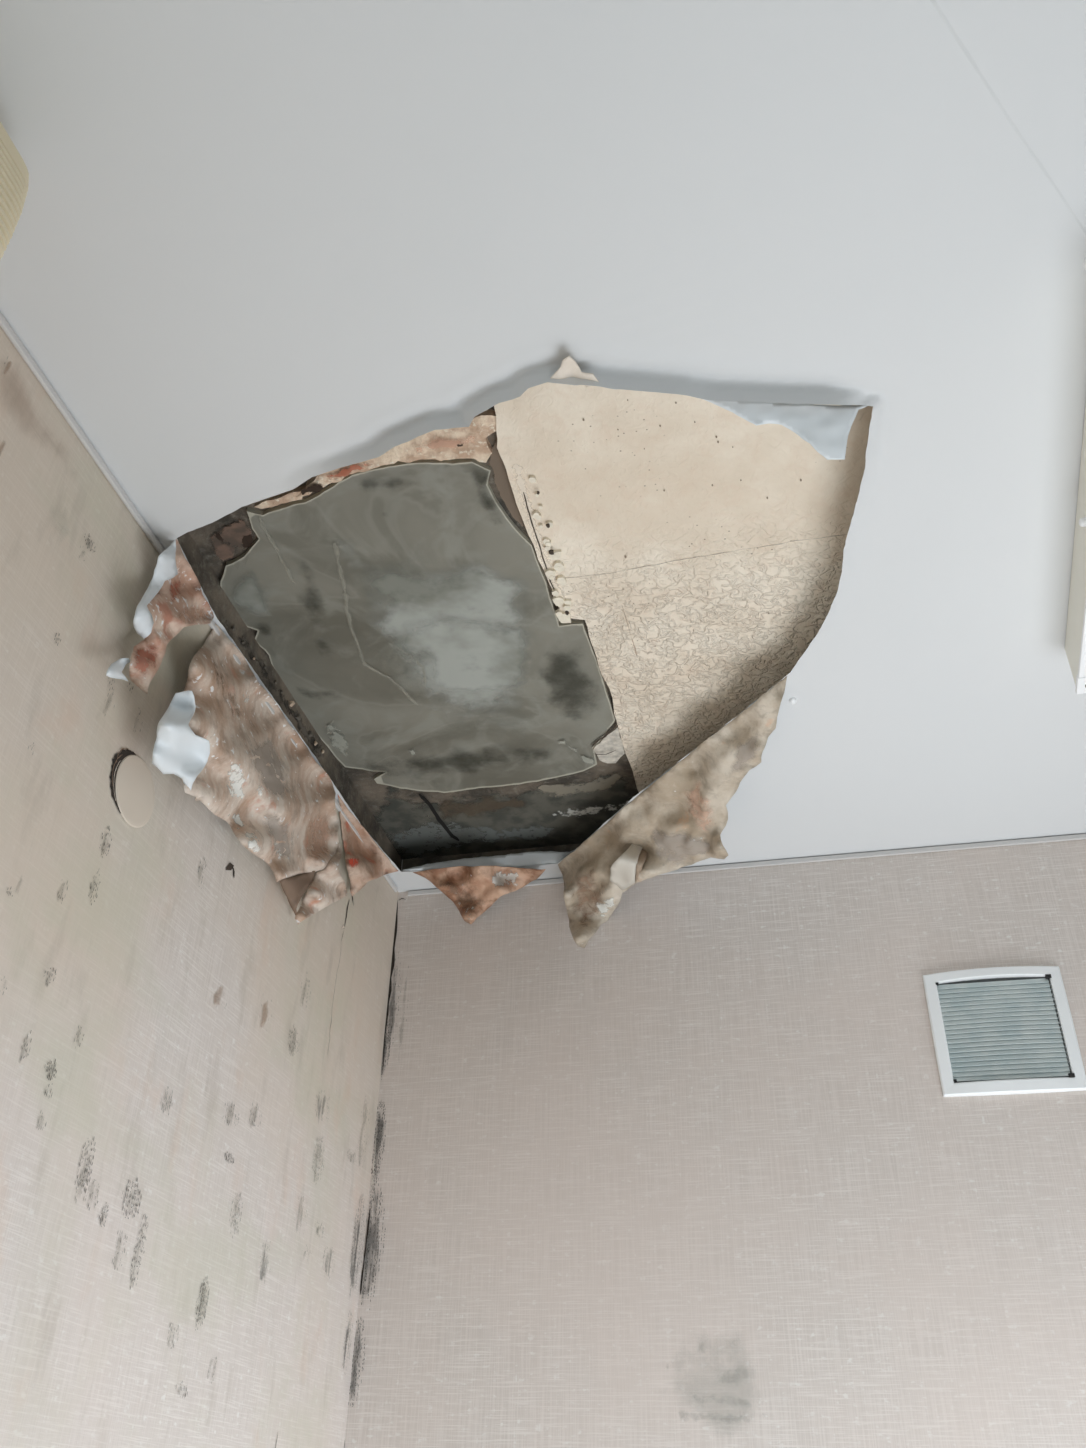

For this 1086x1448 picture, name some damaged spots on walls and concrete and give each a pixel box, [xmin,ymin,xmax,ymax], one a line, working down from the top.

spalling [254,409,496,509]
spalling [211,520,253,560]
peeling [529,475,571,623]
spalling [226,620,324,756]
damp [177,437,632,872]
spalling [592,723,625,763]
peeling [227,764,262,852]
peeling [596,898,614,916]
damp [381,958,409,1080]
damp [75,1139,148,1289]
damp [168,1276,209,1346]
damp [342,1095,386,1407]